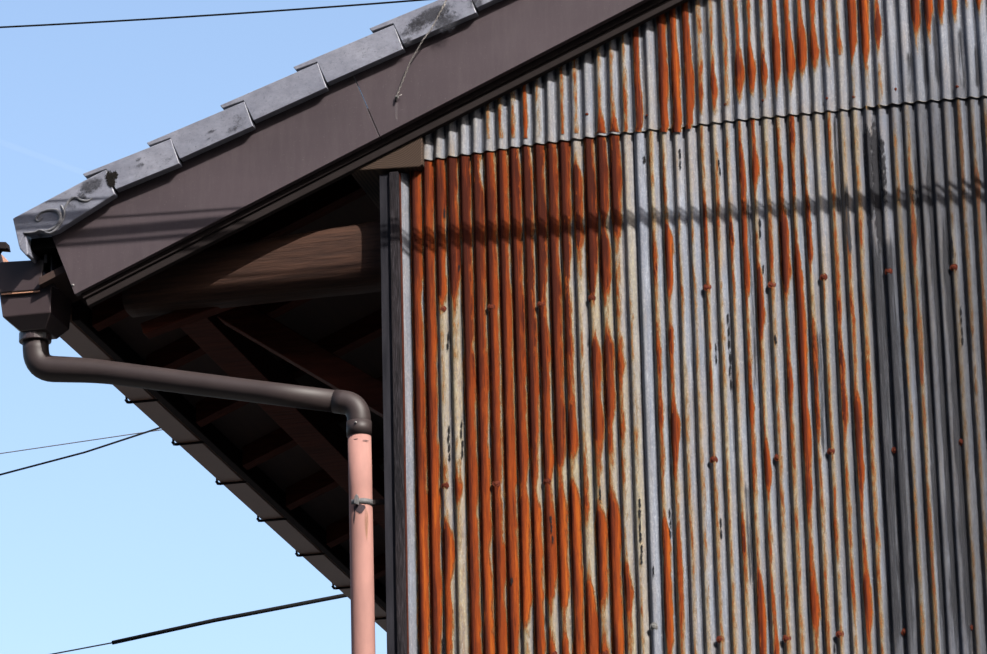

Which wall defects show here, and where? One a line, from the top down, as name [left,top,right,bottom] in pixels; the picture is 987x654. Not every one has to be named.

rust [910,0,982,50]
rust [409,0,884,654]
rust [893,122,940,654]
rust [949,99,987,494]
rust [969,510,987,607]